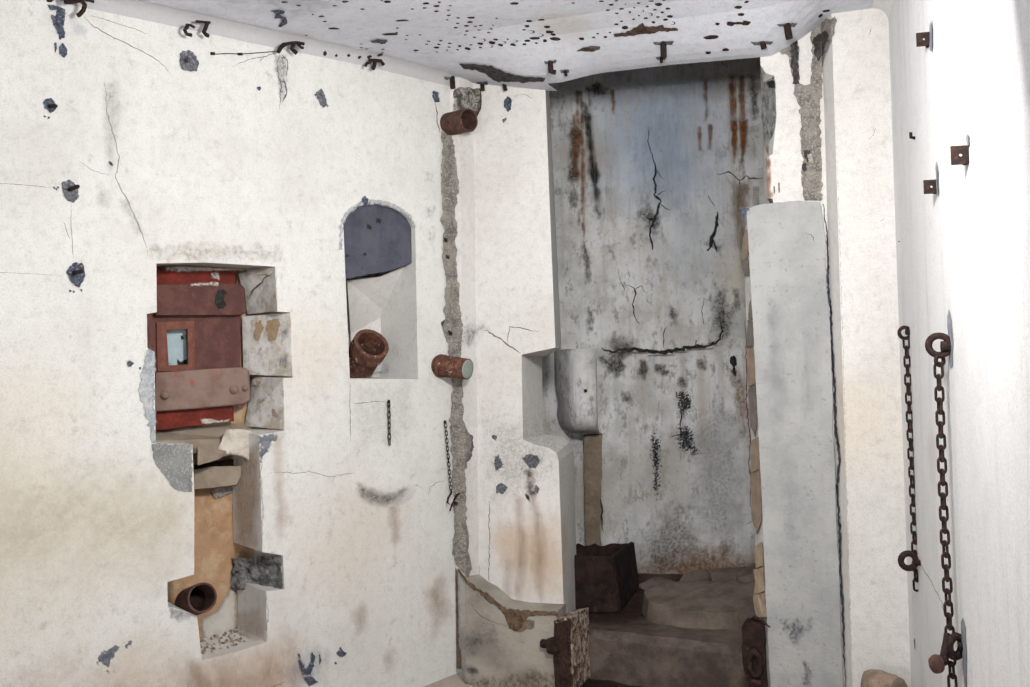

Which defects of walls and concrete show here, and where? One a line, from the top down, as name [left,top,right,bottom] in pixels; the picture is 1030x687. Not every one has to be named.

spalling [779,17,837,201]
spalling [127,349,193,492]
spalling [440,130,463,358]
spalling [449,378,558,632]
damp [601,341,631,375]
damp [650,433,663,500]
crack [647,126,670,250]
crack [602,283,752,524]
damp [675,379,697,455]
damp [713,292,737,337]
crack [707,171,761,251]
crack [809,204,846,687]